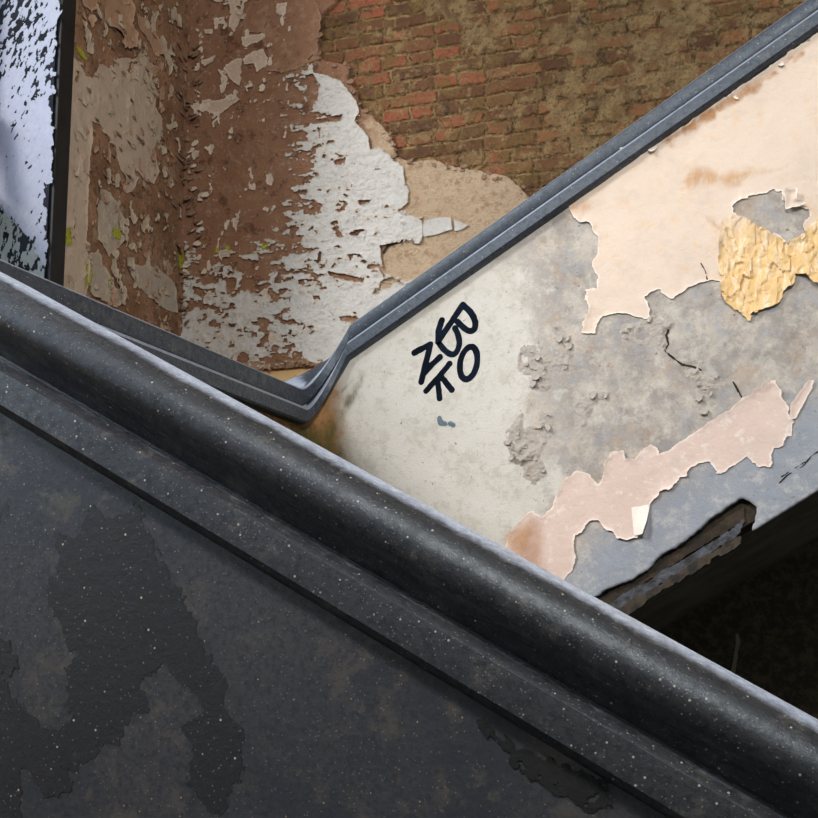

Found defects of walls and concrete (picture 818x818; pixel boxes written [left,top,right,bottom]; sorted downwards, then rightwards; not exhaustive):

peeling [0,0,63,278]
spalling [64,0,818,371]
crack [665,329,702,371]
peeling [505,380,814,580]
crack [779,451,818,483]
spalling [599,507,746,616]
spalling [476,719,614,813]